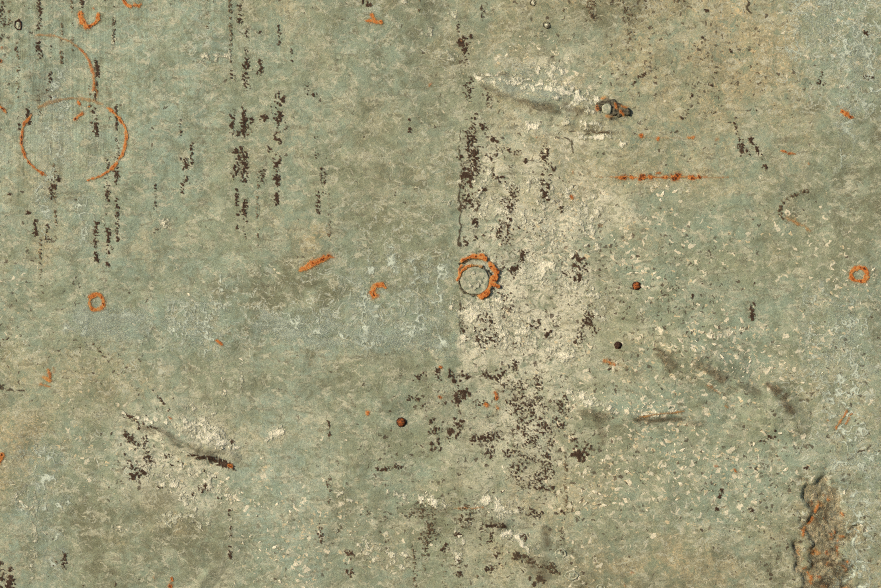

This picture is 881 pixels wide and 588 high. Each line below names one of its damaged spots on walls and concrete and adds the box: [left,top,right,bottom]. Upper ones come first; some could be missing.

corrosion [78,8,100,29]
water stain [18,0,74,275]
water stain [72,104,120,266]
corrosion [87,107,128,181]
water stain [229,91,294,246]
water stain [456,112,528,246]
corrosion [615,172,701,181]
corrosion [88,292,105,311]
corrosion [456,253,501,300]
water stain [561,252,588,283]
corrosion [849,265,870,283]
water stain [412,360,592,515]